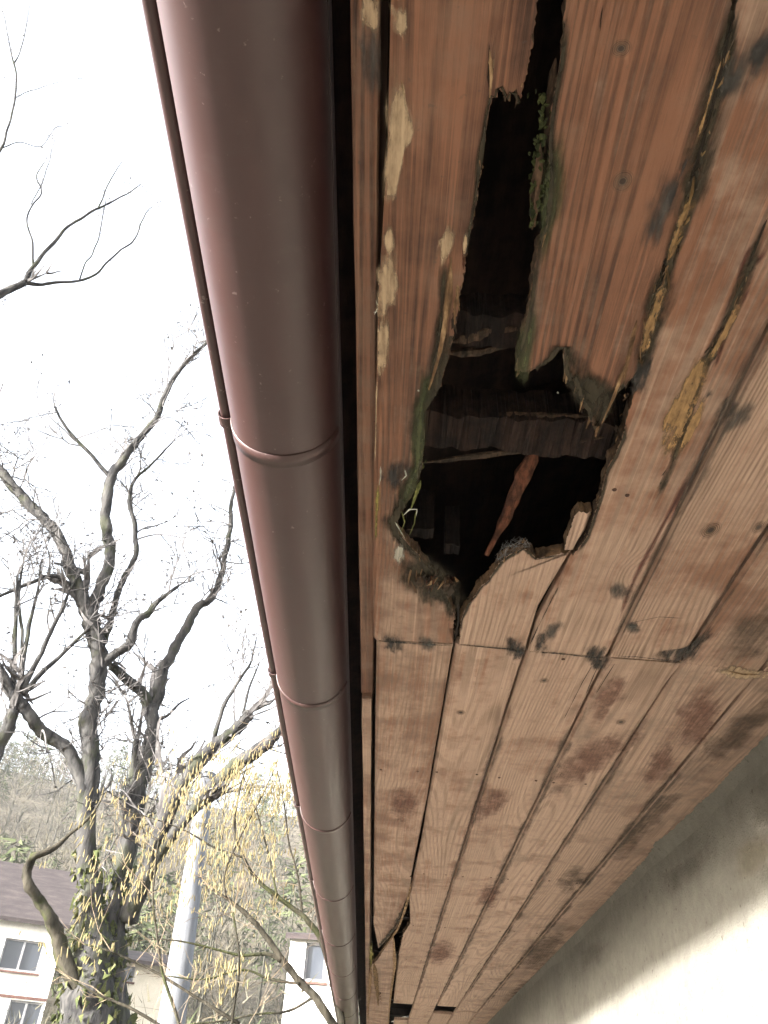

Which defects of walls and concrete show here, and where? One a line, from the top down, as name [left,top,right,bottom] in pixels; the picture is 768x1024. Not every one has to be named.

peeling [391,7,407,34]
peeling [385,80,413,196]
peeling [374,229,398,372]
water stain [387,464,412,488]
water stain [394,546,460,605]
water stain [714,707,768,757]